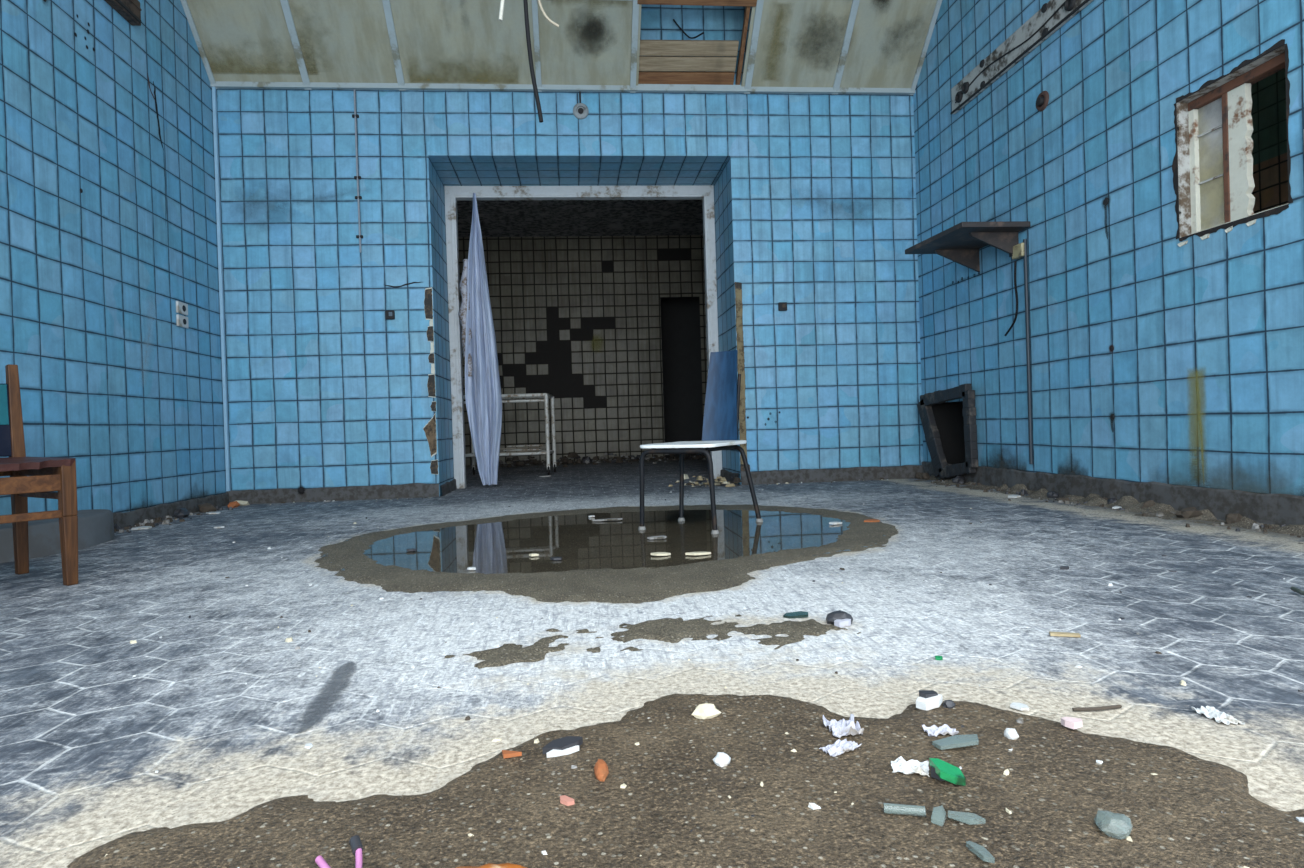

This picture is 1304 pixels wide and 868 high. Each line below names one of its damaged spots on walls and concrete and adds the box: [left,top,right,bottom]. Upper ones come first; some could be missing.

damp [576,18,604,51]
spalling [1172,39,1293,247]